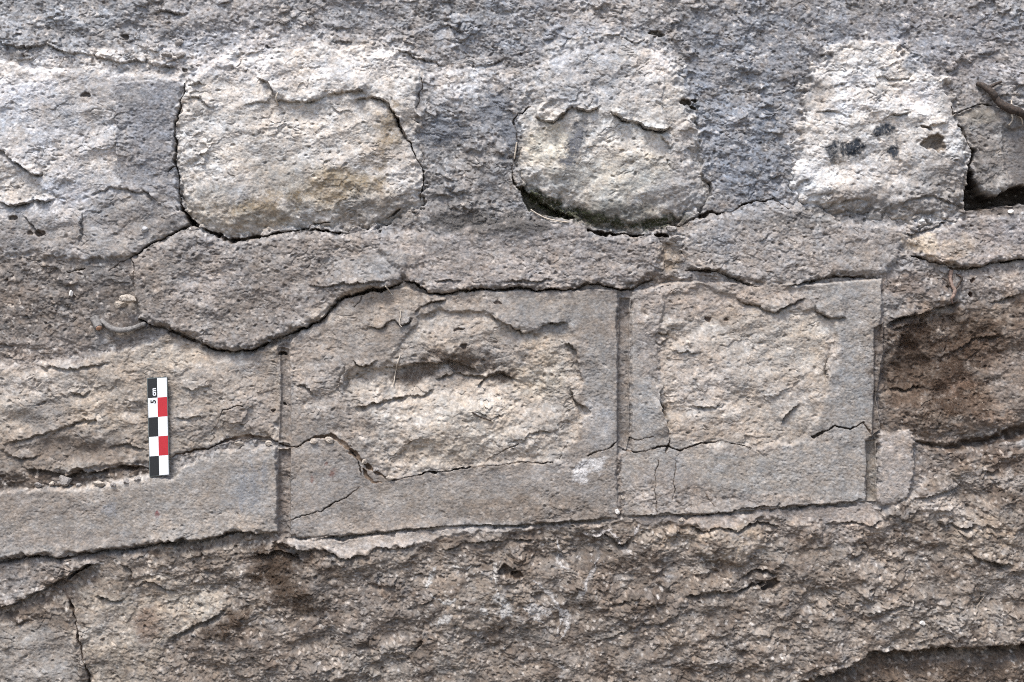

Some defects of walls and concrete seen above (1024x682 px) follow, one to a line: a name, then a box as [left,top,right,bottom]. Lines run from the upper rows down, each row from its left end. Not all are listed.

crack [109,85,340,278]
crack [386,78,425,219]
crack [511,106,531,186]
spalling [963,169,1024,212]
crack [141,280,653,354]
water stain [875,317,1010,423]
crack [113,464,149,472]
crack [173,405,554,521]
crack [588,437,752,514]
crack [811,422,872,439]
crack [217,531,245,539]
crack [0,542,166,682]